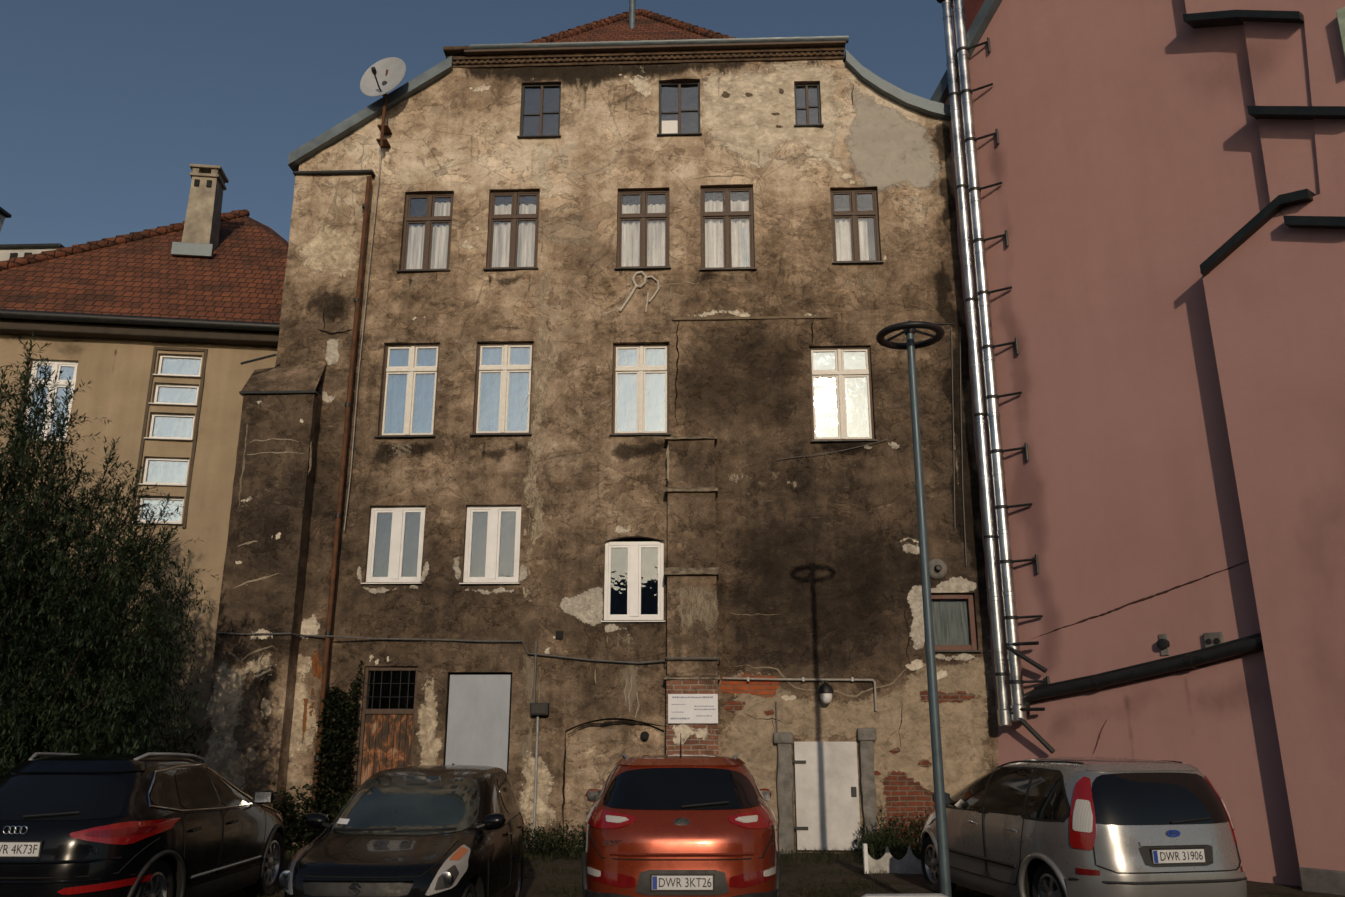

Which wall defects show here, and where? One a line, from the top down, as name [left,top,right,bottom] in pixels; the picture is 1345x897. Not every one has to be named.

flaking render [199,629,276,790]
peeling [416,678,443,765]
flaking render [672,653,990,850]